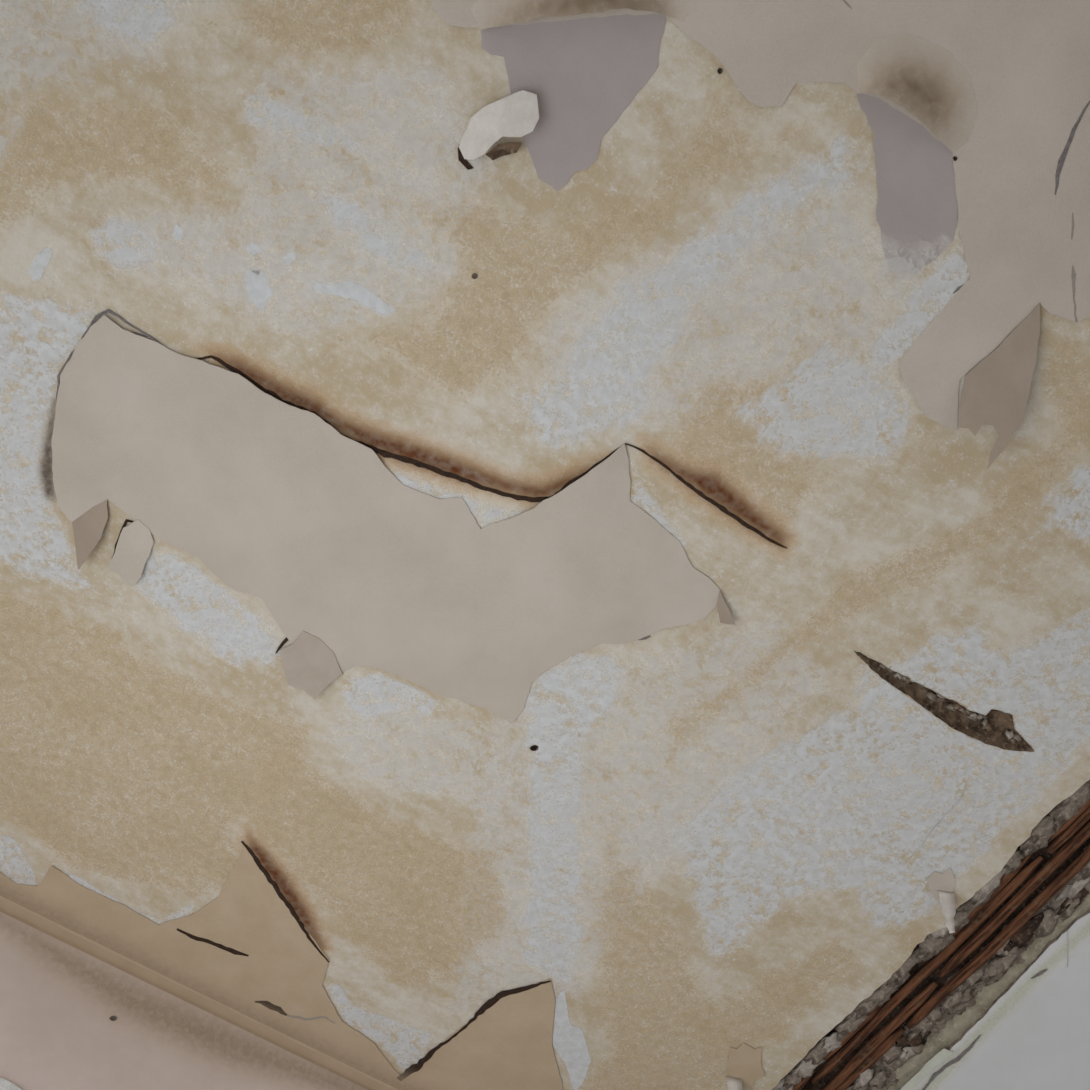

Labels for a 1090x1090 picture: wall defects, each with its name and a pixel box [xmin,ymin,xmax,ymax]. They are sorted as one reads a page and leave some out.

water stain [0,101,224,218]
peeling [458,90,539,170]
water stain [382,110,738,391]
peeling [498,0,1090,469]
water stain [671,342,1090,751]
water stain [0,597,501,980]
peeling [0,293,736,1090]
crack [0,1078,21,1090]
crack [255,1001,335,1023]
crack [397,981,551,1081]
water stain [553,868,843,1090]
peeling [726,1043,765,1090]